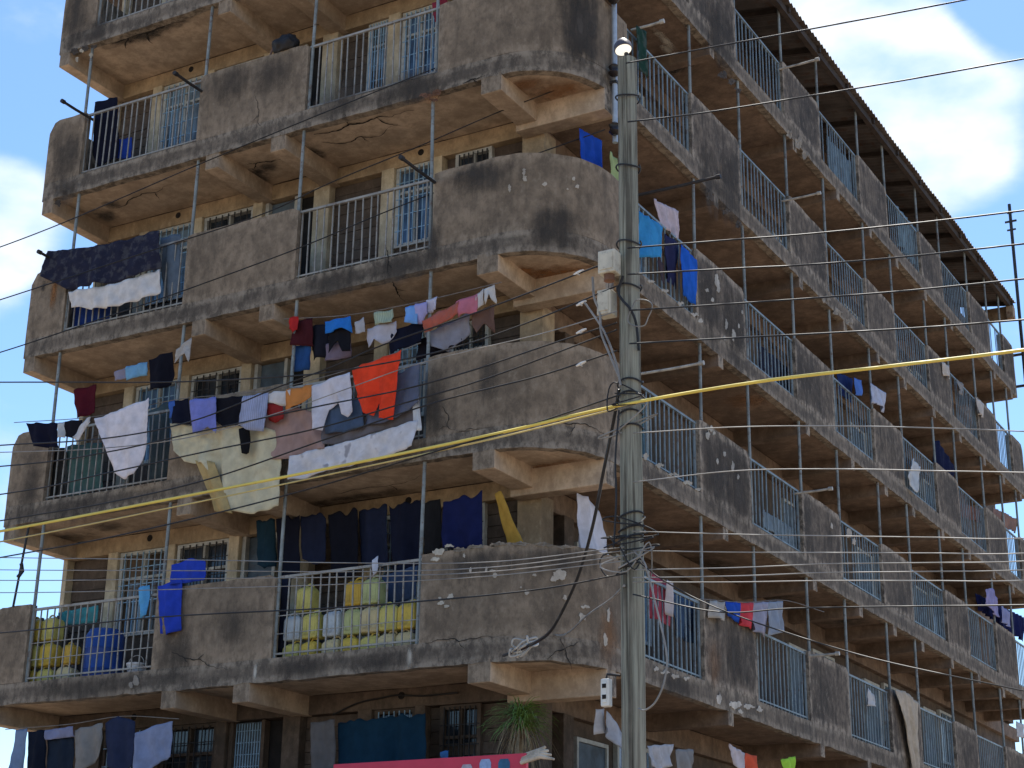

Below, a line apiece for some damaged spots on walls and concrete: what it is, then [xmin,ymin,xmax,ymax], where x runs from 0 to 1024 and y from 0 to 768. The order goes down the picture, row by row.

crack [314,110,413,144]
spalling [431,541,573,572]
peeling [550,569,566,582]